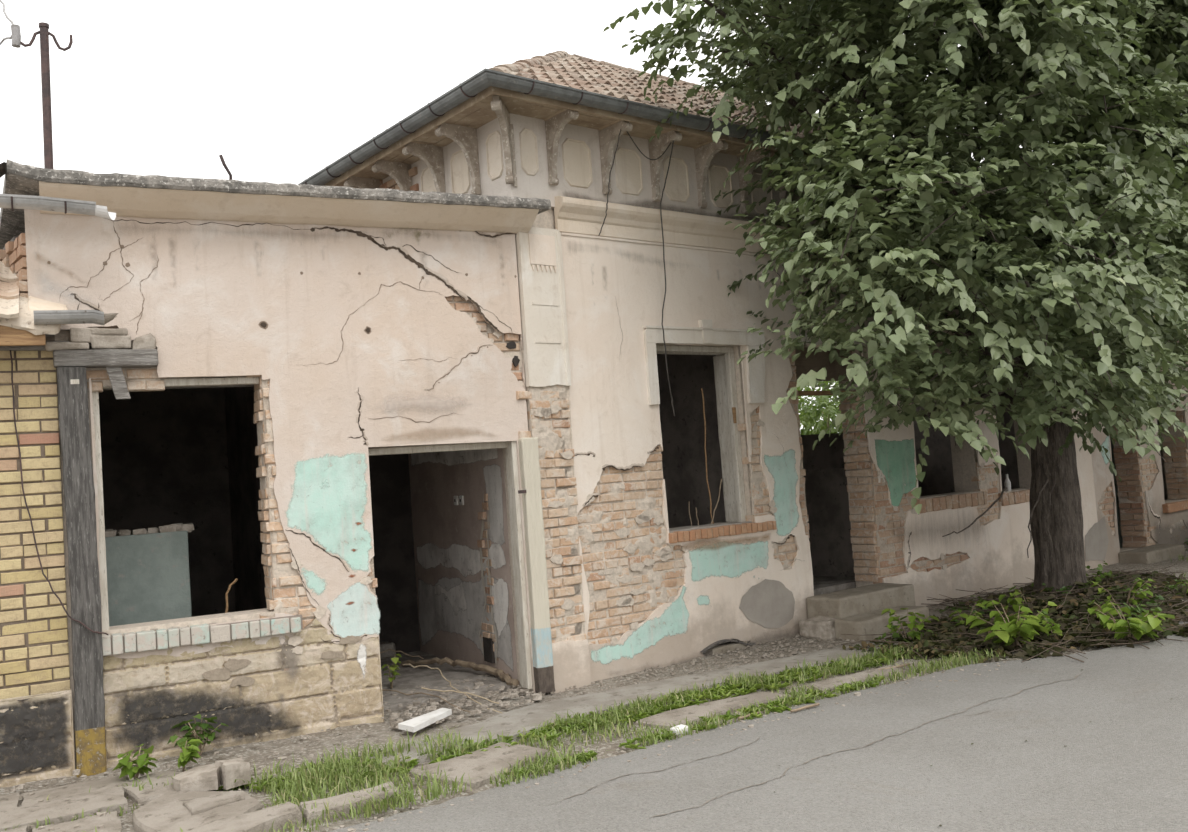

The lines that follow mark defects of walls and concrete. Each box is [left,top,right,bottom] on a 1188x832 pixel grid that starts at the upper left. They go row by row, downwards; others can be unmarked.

crack [59,218,517,391]
leakage [0,697,68,777]
leakage [116,690,298,749]
flaking render [103,375,384,768]
leakage [281,641,296,675]
crack [352,387,369,445]
peeling [411,449,513,671]
flaking render [445,296,810,664]